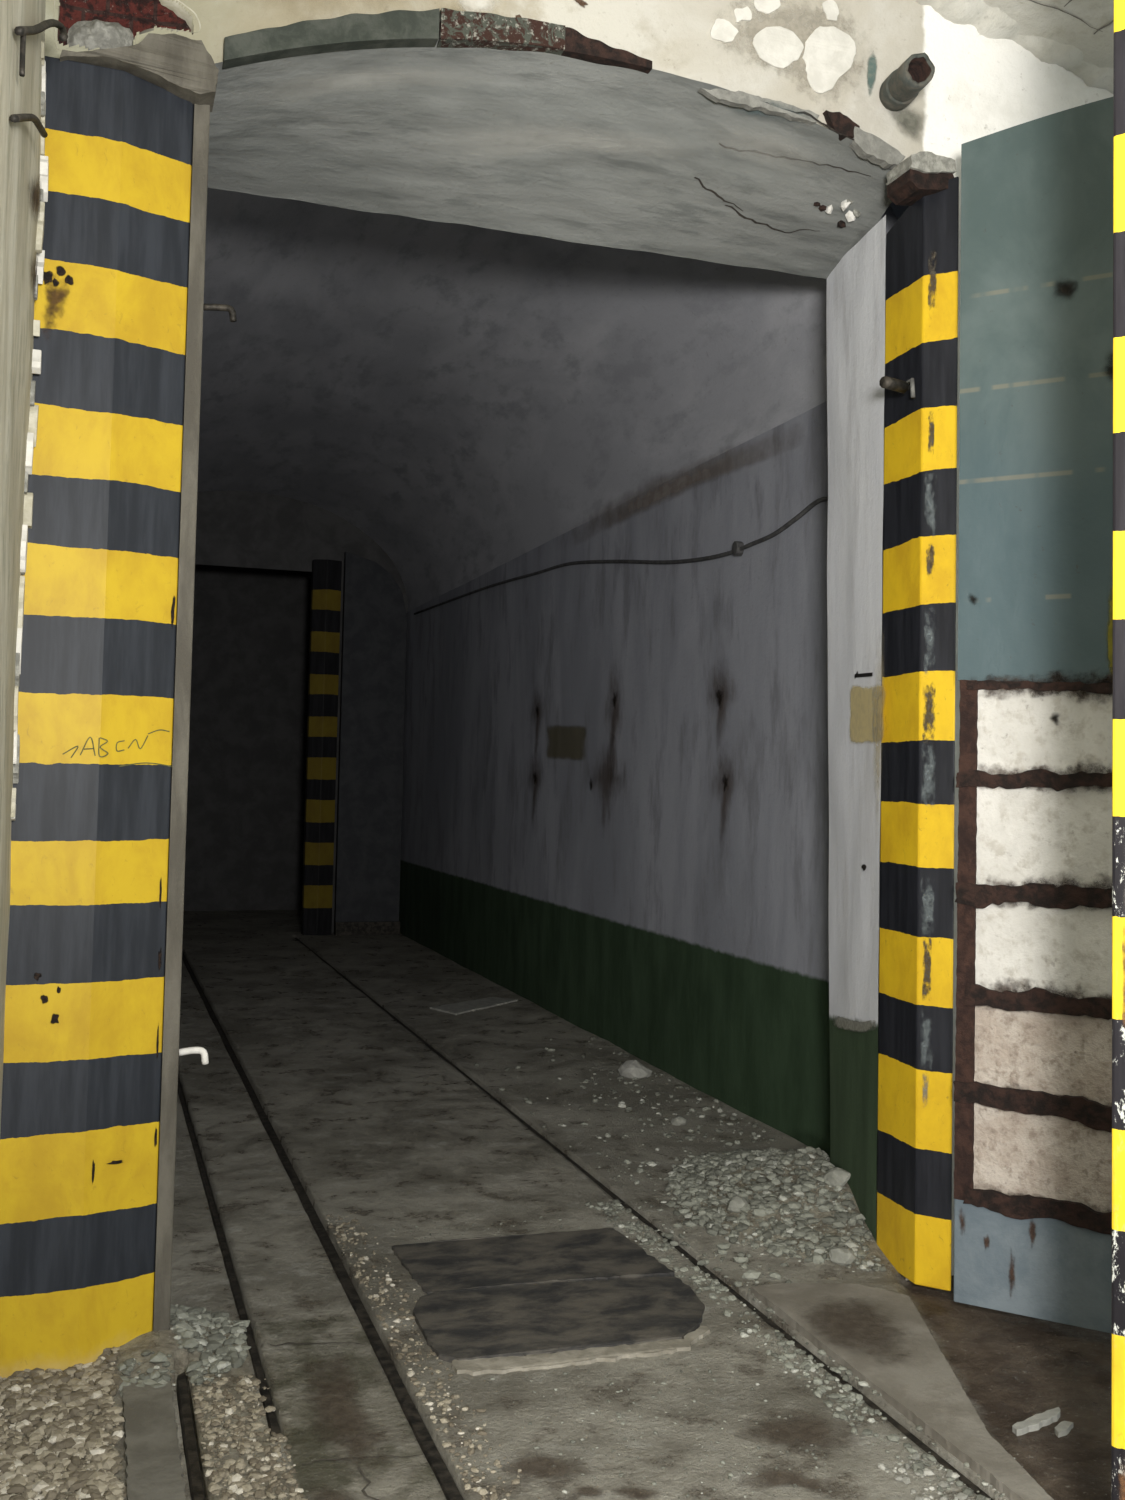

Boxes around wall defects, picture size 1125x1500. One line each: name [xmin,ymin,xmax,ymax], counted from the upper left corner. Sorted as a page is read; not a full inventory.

flaking render [34,0,201,300]
crack [694,177,814,233]
crack [719,102,871,177]
peeling [698,0,957,206]
flaking render [11,320,41,820]